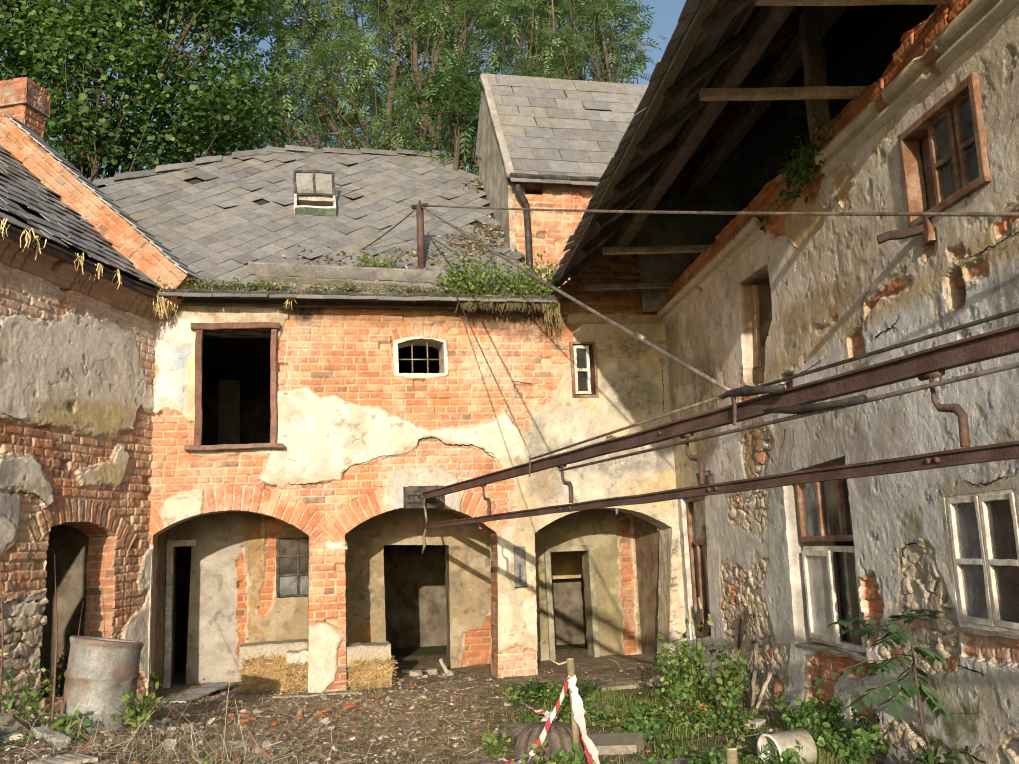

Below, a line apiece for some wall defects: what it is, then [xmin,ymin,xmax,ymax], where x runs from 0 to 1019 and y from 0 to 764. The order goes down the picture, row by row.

flaking render [667,0,973,301]
crack [859,292,900,338]
flaking render [914,221,995,341]
crack [964,232,1019,259]
flaking render [0,235,658,714]
flaking render [737,416,776,479]
crack [964,476,1014,486]
flaking render [718,488,1019,764]